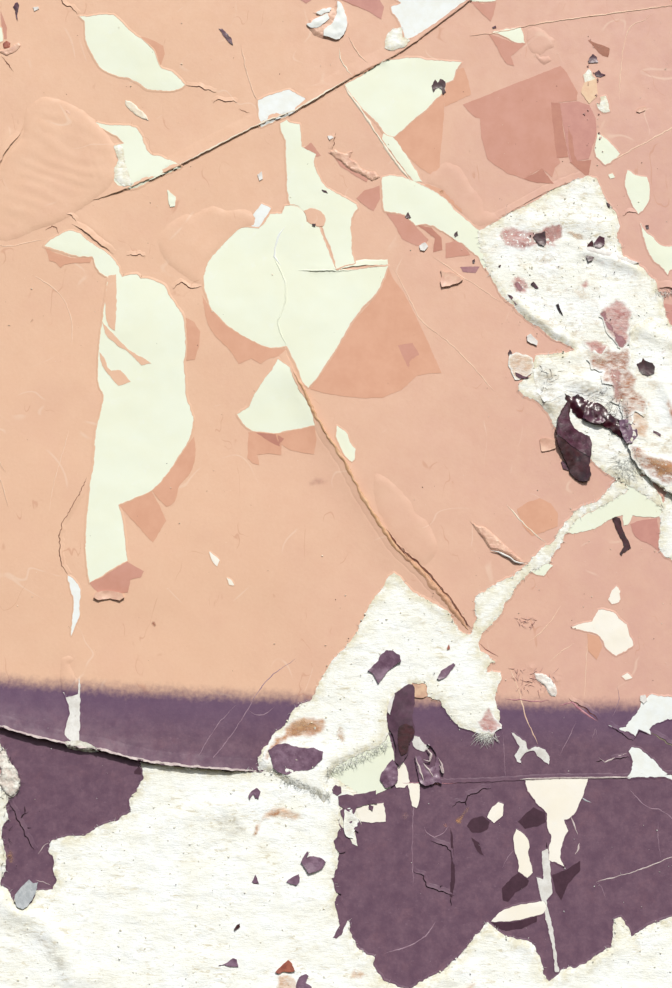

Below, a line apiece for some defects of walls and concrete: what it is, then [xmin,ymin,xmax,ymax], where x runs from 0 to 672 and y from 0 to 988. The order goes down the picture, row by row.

peeling [78,13,186,93]
crack [186,81,248,113]
peeling [202,56,486,434]
peeling [42,229,195,637]
peeling [540,389,638,482]
crack [386,529,472,629]
peeling [368,650,401,684]
peeling [268,743,323,775]
peeling [330,684,444,824]
peeling [607,693,672,782]
peeling [287,852,326,885]
peeling [490,778,589,973]